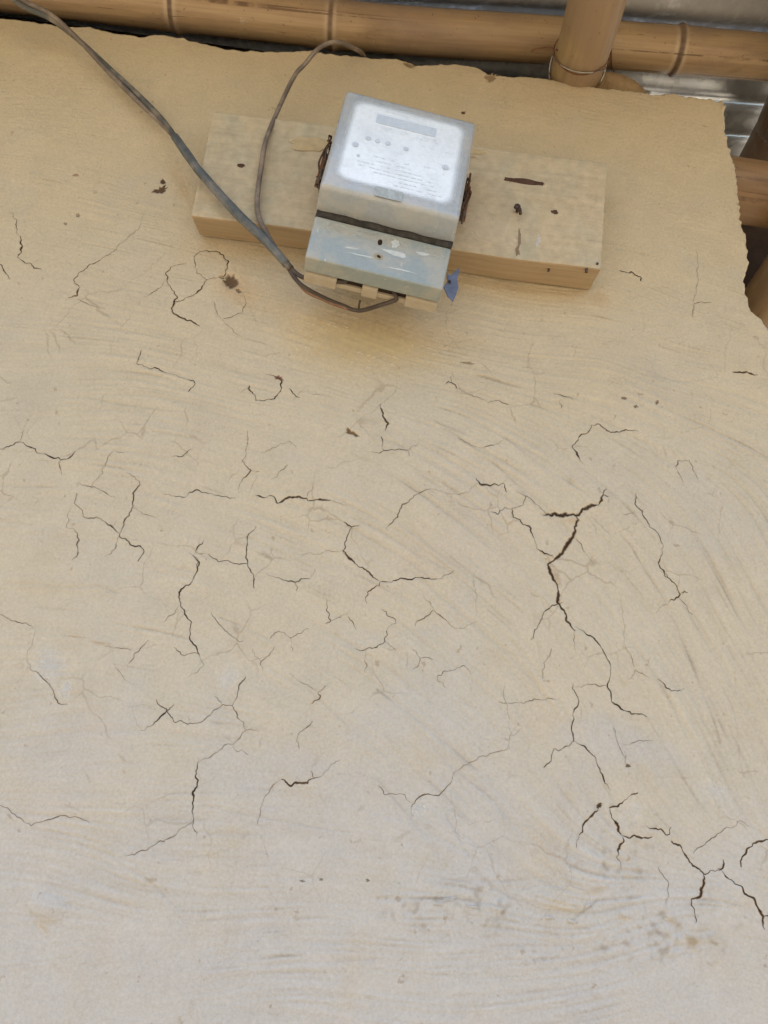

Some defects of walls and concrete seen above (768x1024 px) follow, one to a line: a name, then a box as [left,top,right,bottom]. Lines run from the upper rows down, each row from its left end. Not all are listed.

crack [0,217,42,279]
crack [146,250,246,335]
crack [244,373,315,401]
crack [5,426,75,473]
crack [375,407,416,453]
crack [572,424,634,459]
crack [3,615,67,705]
crack [66,431,472,856]
crack [381,479,768,930]
crack [0,805,90,826]